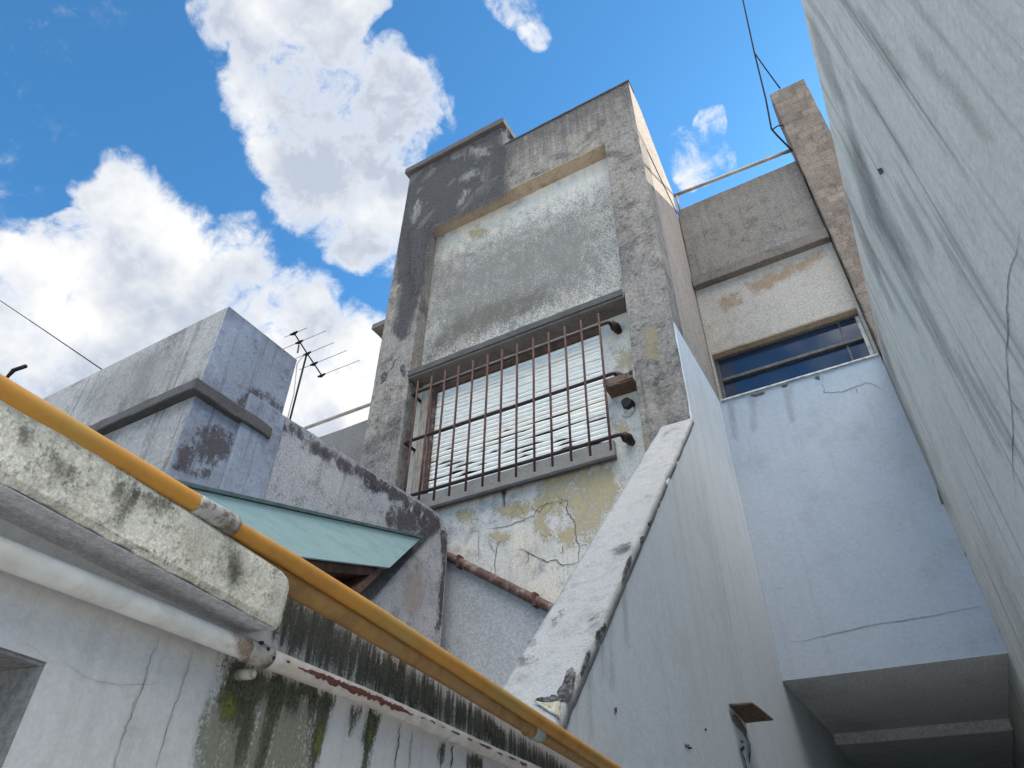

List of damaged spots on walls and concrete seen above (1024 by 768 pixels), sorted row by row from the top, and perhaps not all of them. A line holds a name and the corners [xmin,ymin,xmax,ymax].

damp [393,130,623,365]
crack [1005,234,1023,496]
damp [173,425,233,478]
crack [25,634,194,768]
damp [218,658,336,768]
damp [237,388,448,633]
damp [273,596,570,768]
crack [478,498,585,573]
spalling [533,623,607,718]
flaking render [621,555,632,583]
crack [797,606,980,642]